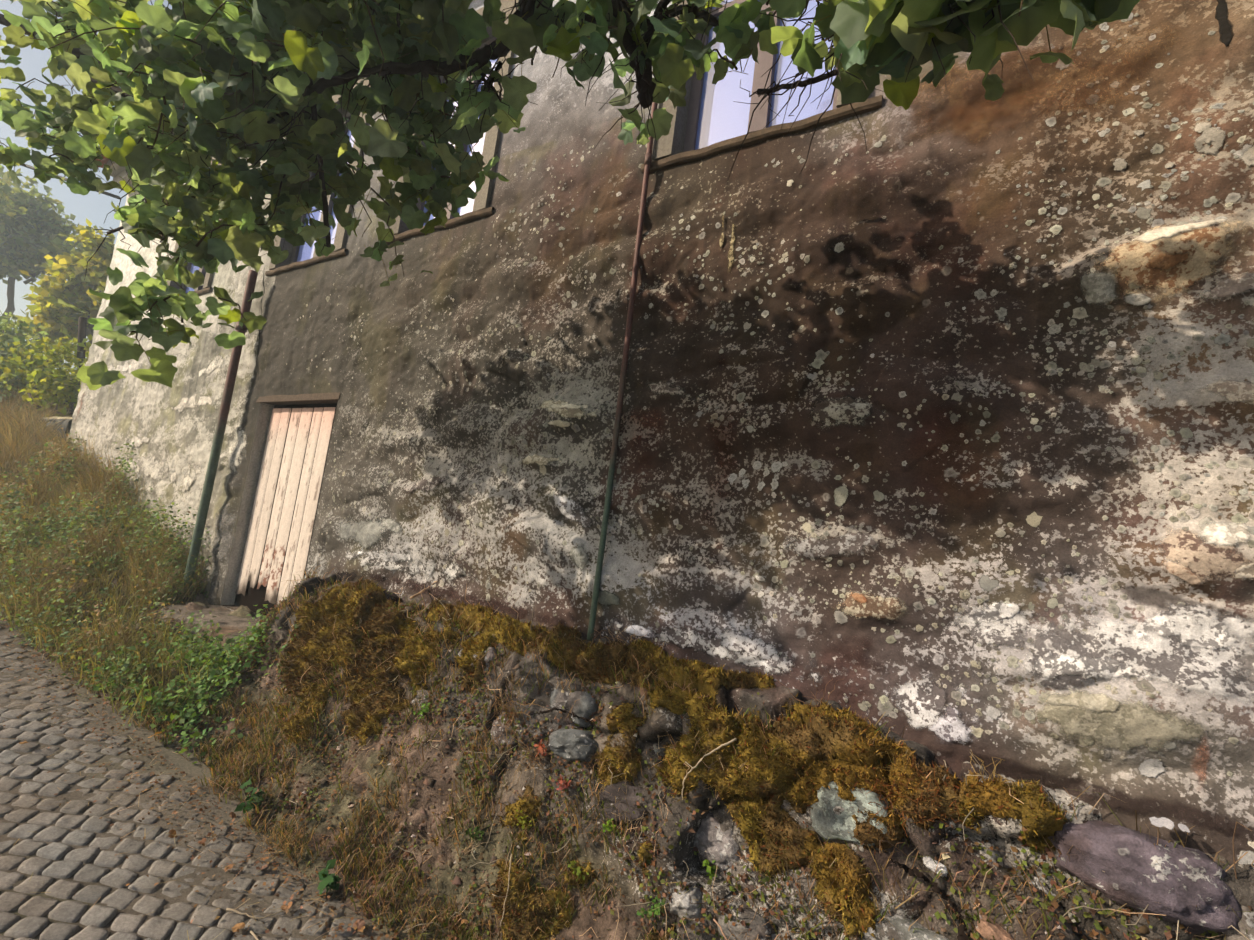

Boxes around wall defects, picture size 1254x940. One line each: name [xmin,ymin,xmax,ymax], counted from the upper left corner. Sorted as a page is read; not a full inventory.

flaking render [1081,219,1254,306]